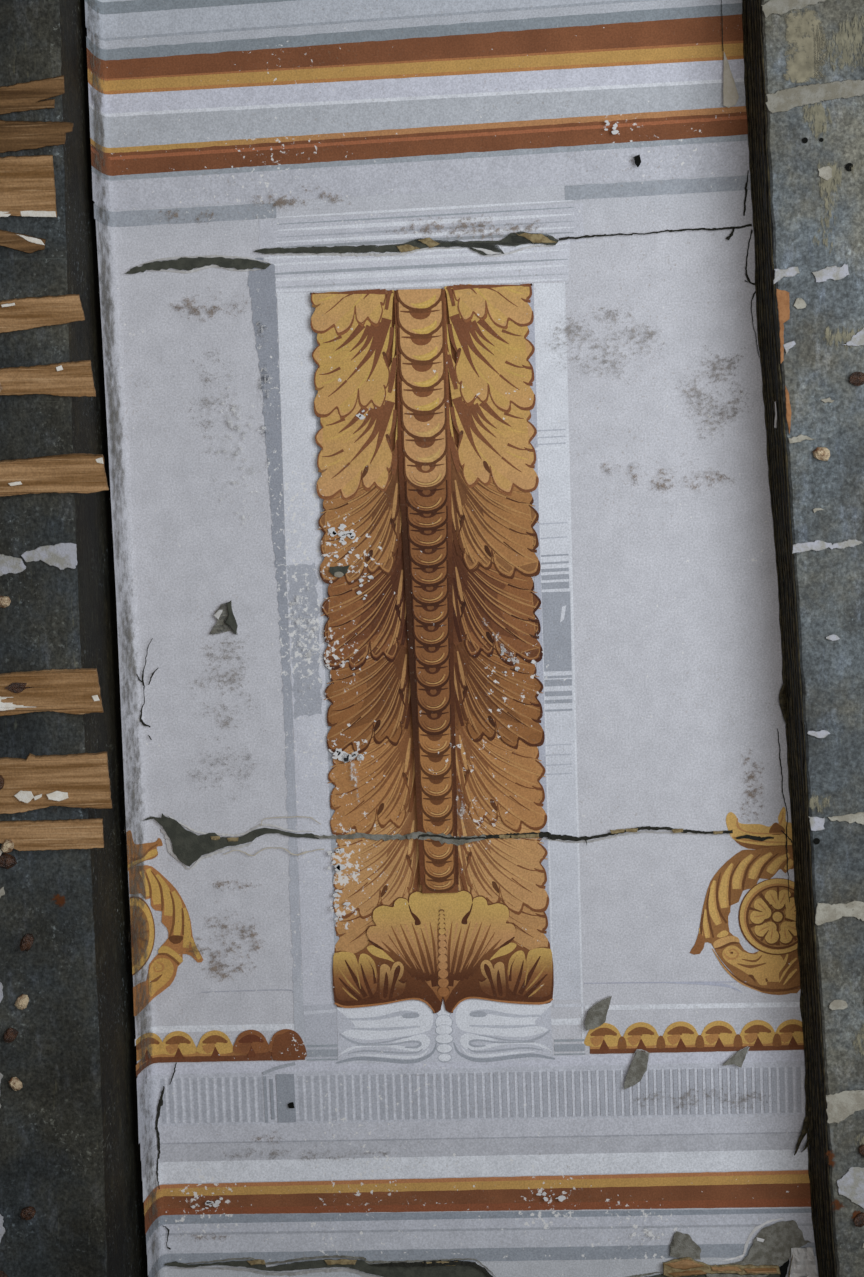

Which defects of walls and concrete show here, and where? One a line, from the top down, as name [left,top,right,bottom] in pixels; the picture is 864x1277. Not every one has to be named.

spalling [210,601,238,635]
crack [137,638,158,740]
crack [143,728,792,902]
spalling [585,996,612,1030]
spalling [624,1049,650,1090]
spalling [723,1046,750,1068]
crack [155,1063,177,1189]
spalling [670,1231,701,1260]
spalling [722,1218,810,1266]